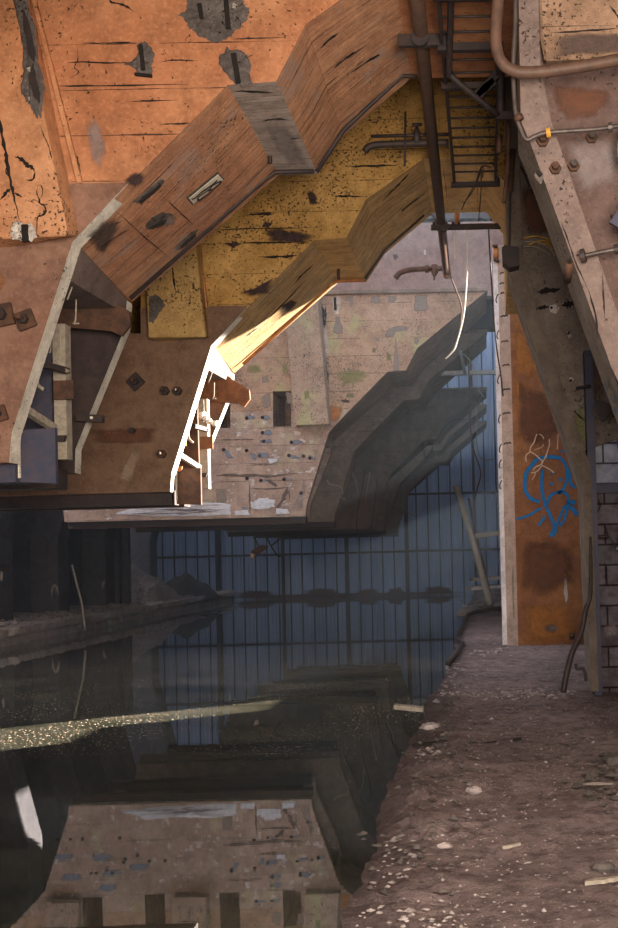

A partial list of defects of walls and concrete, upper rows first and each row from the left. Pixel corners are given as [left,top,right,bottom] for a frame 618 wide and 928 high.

spalling [14,0,45,119]
spalling [124,41,155,78]
spalling [178,0,253,87]
crack [0,120,53,234]
corrosion [515,327,558,452]
corrosion [524,542,572,591]